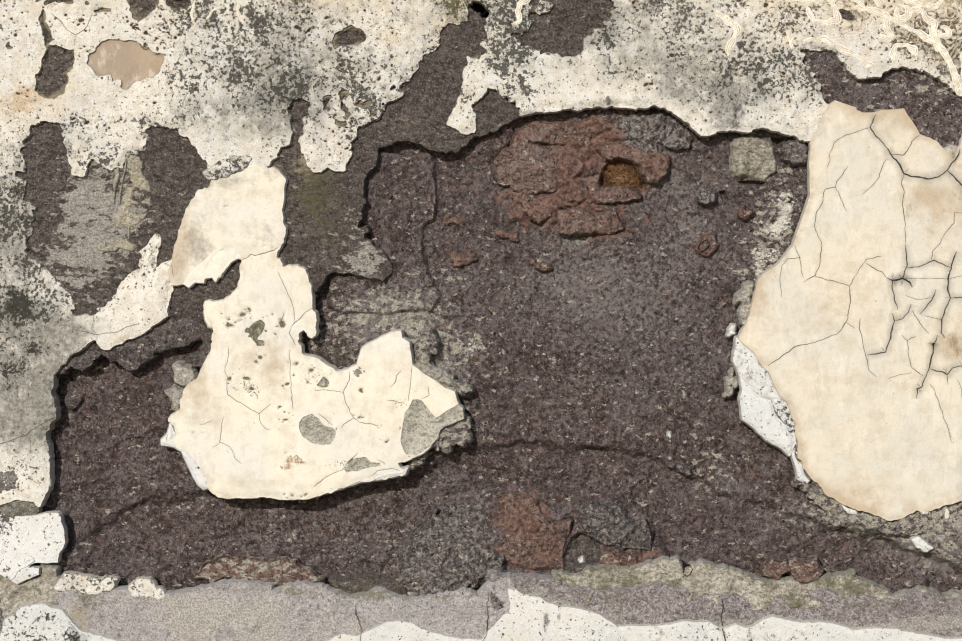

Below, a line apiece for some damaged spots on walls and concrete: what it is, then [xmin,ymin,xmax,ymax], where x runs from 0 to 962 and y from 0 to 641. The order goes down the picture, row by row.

spalling [36,0,111,99]
peeling [511,0,615,57]
spalling [839,9,855,21]
peeling [270,6,521,293]
crack [769,117,962,439]
spalling [0,107,962,611]
spalling [0,563,62,633]
peeling [54,548,564,641]
peeling [511,572,962,637]